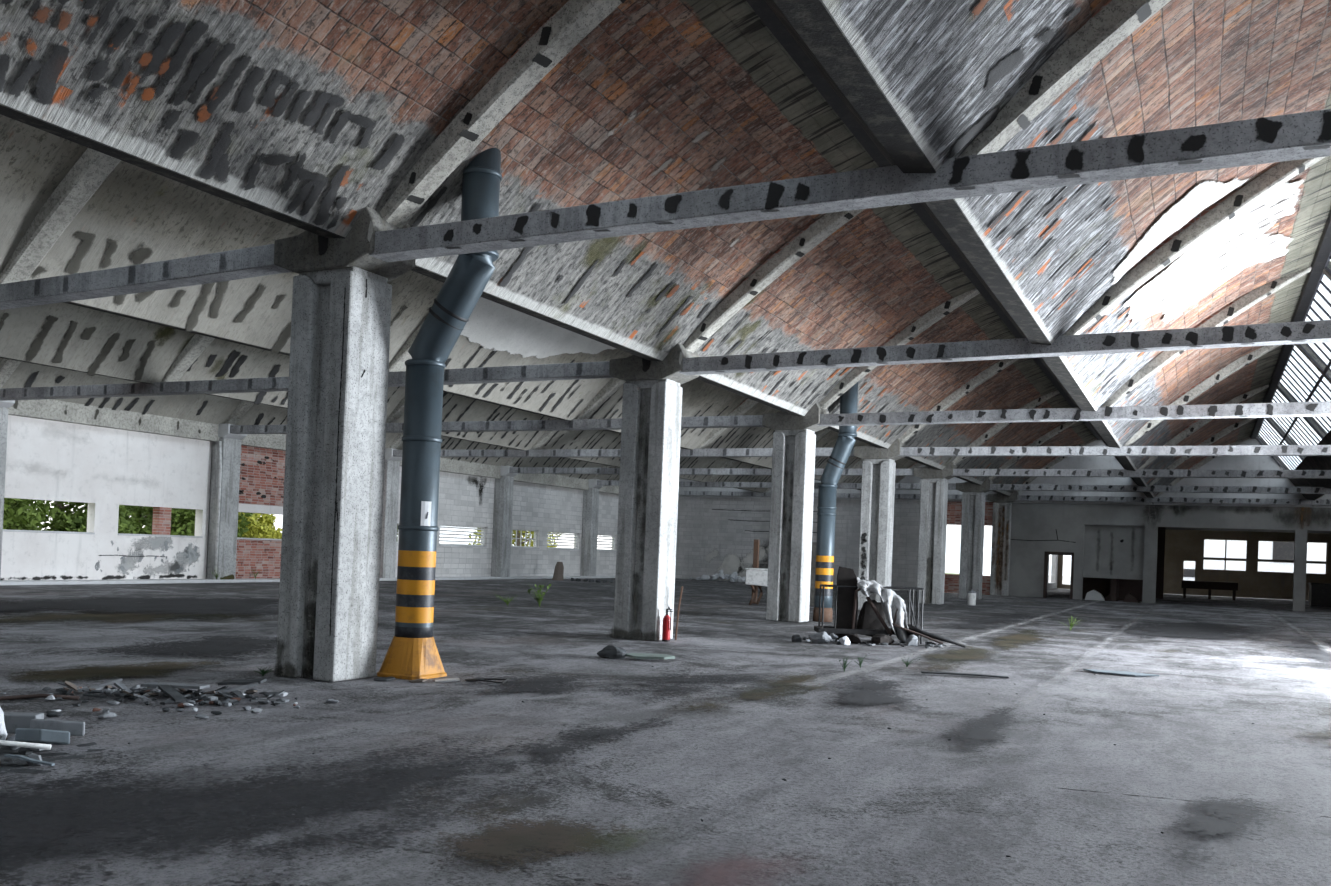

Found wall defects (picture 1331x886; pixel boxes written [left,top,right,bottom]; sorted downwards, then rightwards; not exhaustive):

leakage [0,43,69,105]
leakage [28,0,376,184]
leakage [985,7,1081,91]
spalling [1050,79,1079,106]
leakage [373,134,405,170]
leakage [949,107,1000,190]
spalling [1051,118,1106,145]
leakage [244,153,350,255]
spalling [1043,198,1067,240]
peeling [1084,178,1304,332]
peeling [460,297,616,359]
peeling [0,536,200,580]